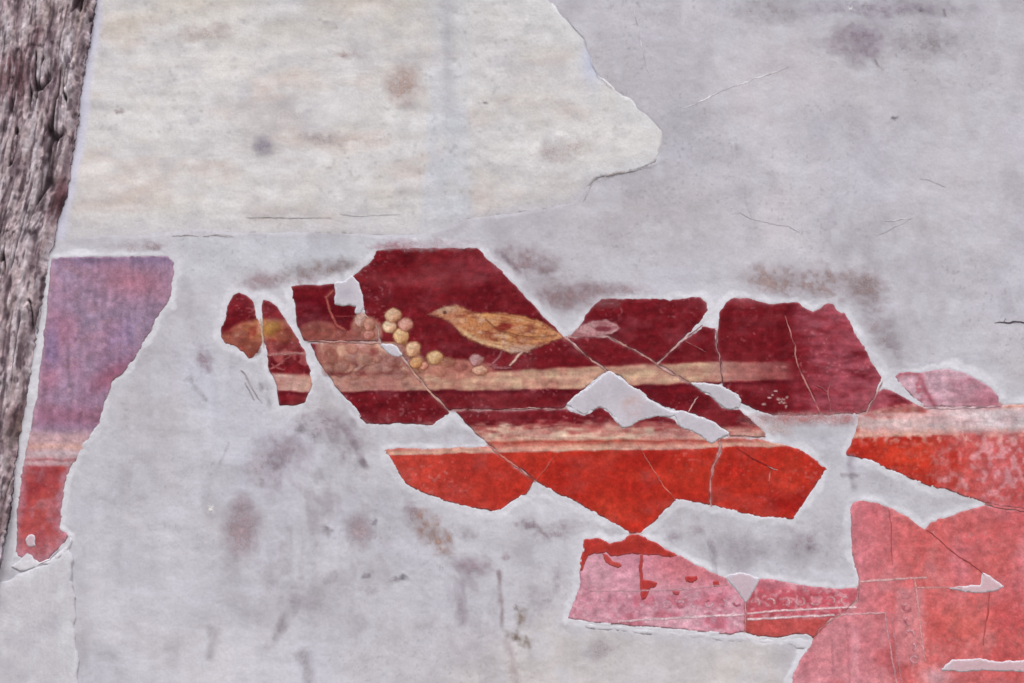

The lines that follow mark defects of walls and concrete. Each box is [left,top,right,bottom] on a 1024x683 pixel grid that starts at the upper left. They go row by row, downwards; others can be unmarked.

flaking render [334,276,364,314]
flaking render [381,343,402,357]
crack [307,314,565,411]
crack [565,338,606,371]
flaking render [567,371,729,443]
crack [609,325,723,412]
flaking render [692,382,741,410]
crack [785,316,831,415]
crack [490,446,554,482]
crack [638,445,676,501]
crack [709,446,777,507]
crack [927,530,990,645]